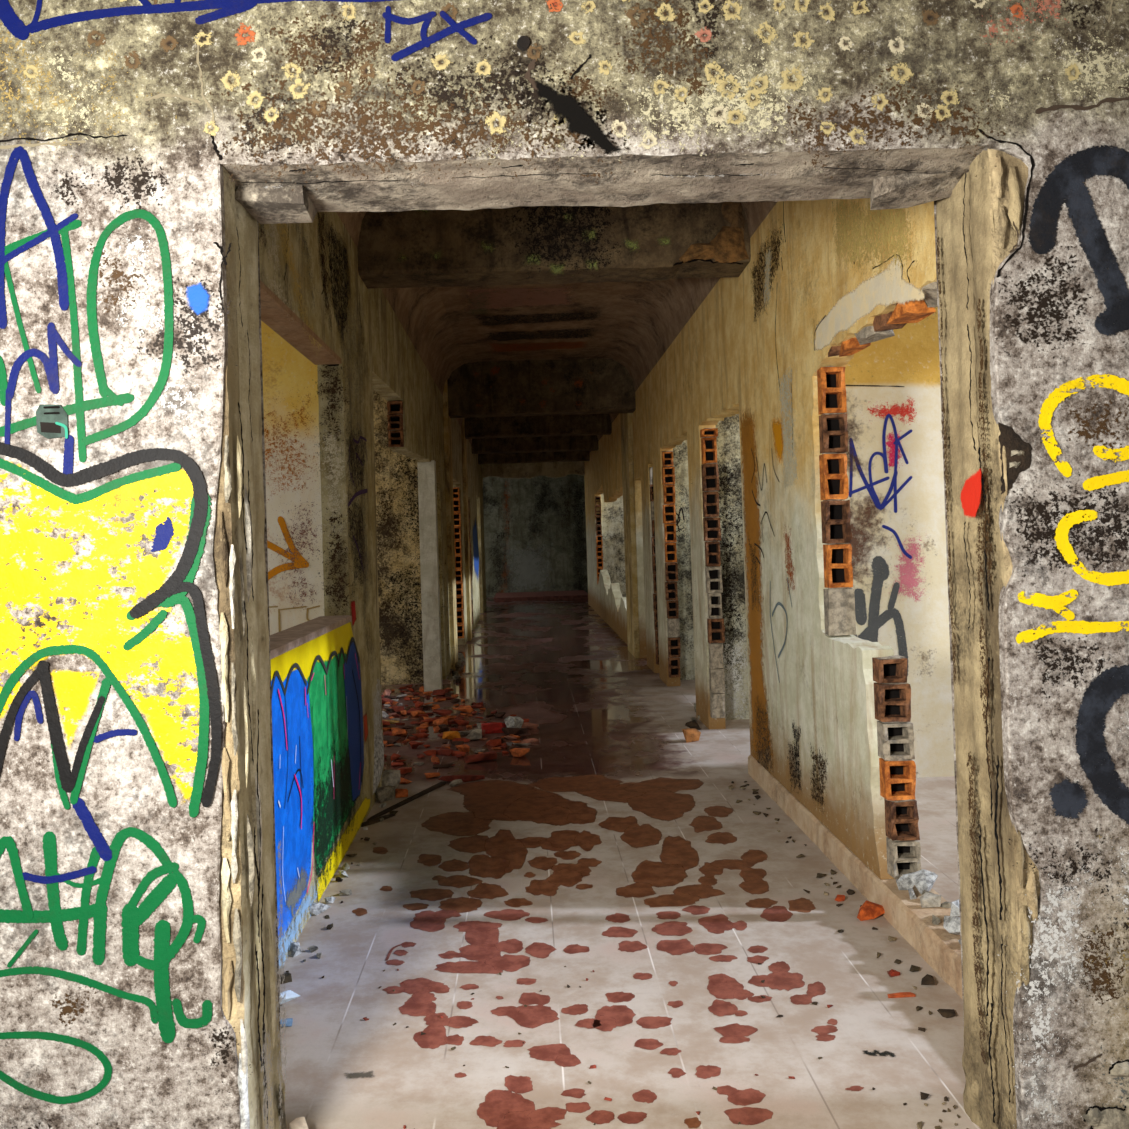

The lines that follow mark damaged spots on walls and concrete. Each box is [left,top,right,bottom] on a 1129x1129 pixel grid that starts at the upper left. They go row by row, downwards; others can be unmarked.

crack [0,133,127,149]
crack [241,169,397,184]
crack [458,54,760,178]
crack [823,165,916,173]
crack [978,129,1035,277]
crack [1035,87,1129,114]
damp [258,212,424,684]
flaking render [814,254,938,636]
crack [963,173,990,630]
crack [213,229,268,1123]
crack [979,657,1011,1123]